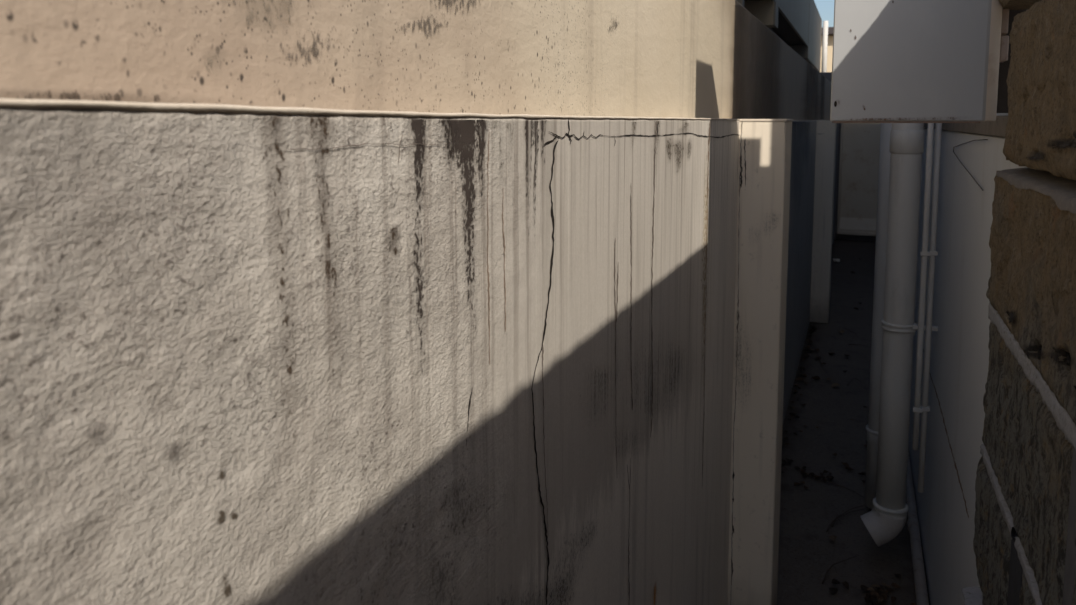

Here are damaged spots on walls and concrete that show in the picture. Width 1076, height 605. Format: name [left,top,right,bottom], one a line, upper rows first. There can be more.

leakage [262,116,288,196]
leakage [277,209,292,300]
leakage [306,117,337,298]
leakage [411,119,426,354]
leakage [439,119,487,328]
leakage [525,120,547,208]
crack [531,118,746,605]